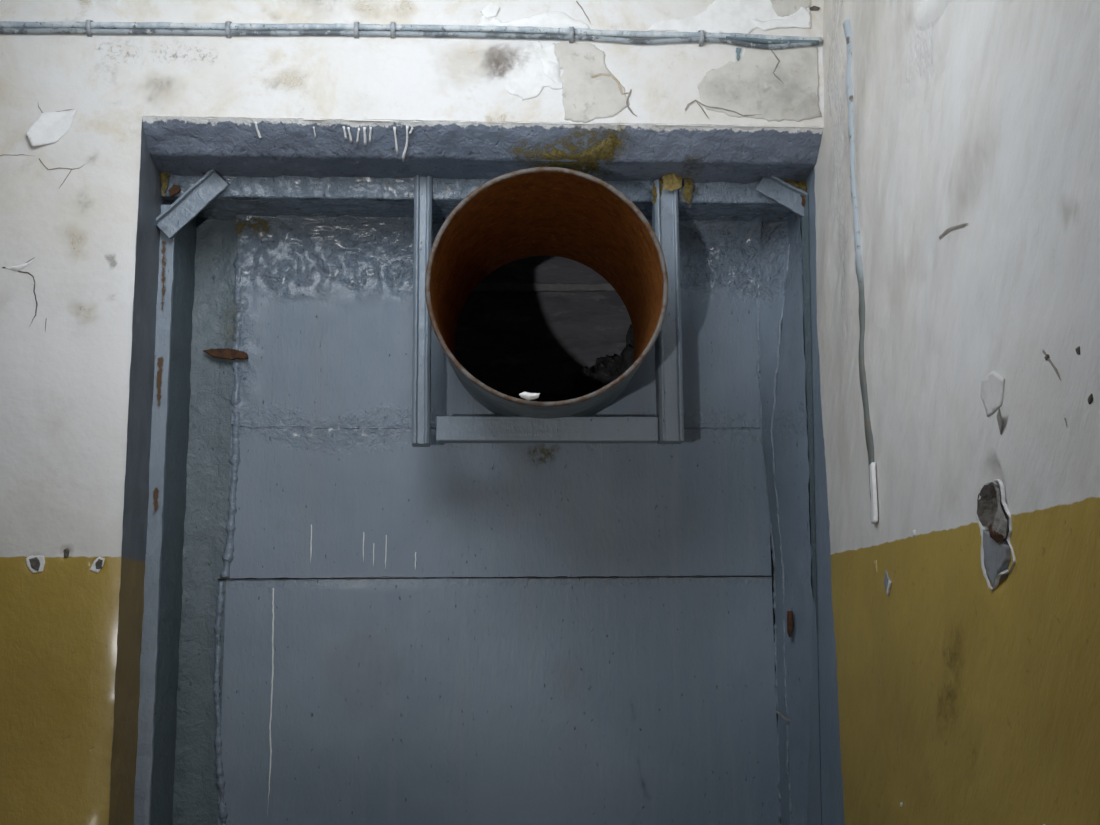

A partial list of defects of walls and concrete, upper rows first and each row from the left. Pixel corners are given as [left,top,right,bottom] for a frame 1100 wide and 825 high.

peeling [646,0,820,34]
damp [488,51,510,75]
peeling [478,1,636,123]
peeling [697,46,822,122]
crack [0,154,85,188]
crack [2,257,47,331]
spalling [976,479,1016,590]